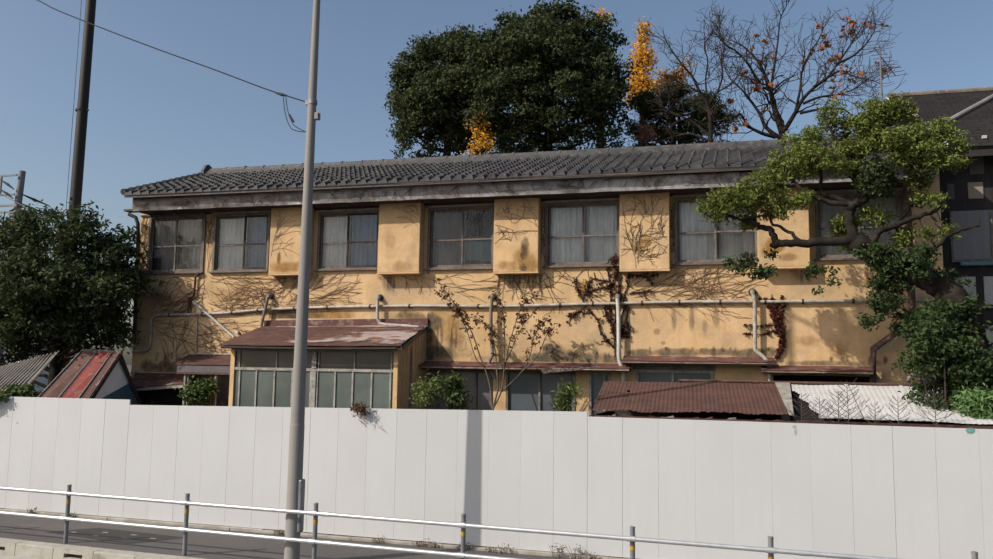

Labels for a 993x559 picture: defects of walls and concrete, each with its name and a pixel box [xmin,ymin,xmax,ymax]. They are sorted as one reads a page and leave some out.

damp [513,245,541,284]
damp [271,310,296,318]
damp [398,311,460,360]
damp [533,344,617,363]
damp [628,347,777,357]